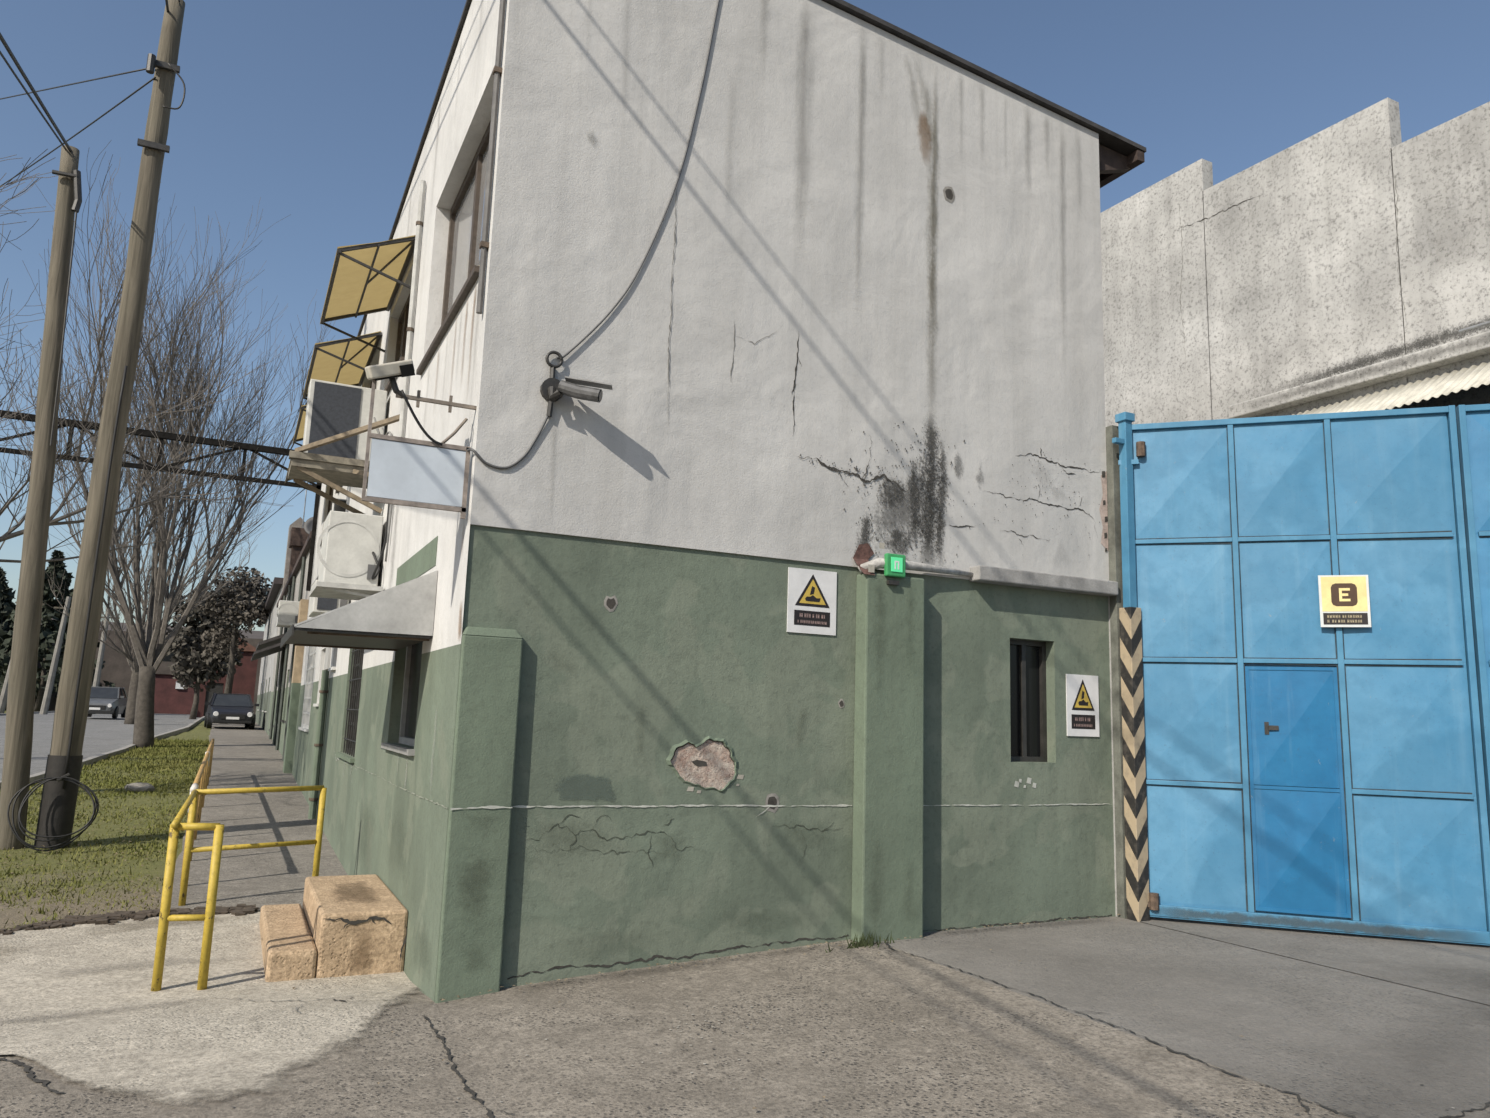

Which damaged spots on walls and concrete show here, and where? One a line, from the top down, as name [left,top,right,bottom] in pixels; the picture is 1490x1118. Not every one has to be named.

damp [800,421,1100,563]
crack [950,448,1101,543]
spalling [666,736,744,793]
crack [507,934,849,980]
crack [215,916,514,1118]
crack [884,914,1378,1118]
crack [1438,1102,1490,1118]